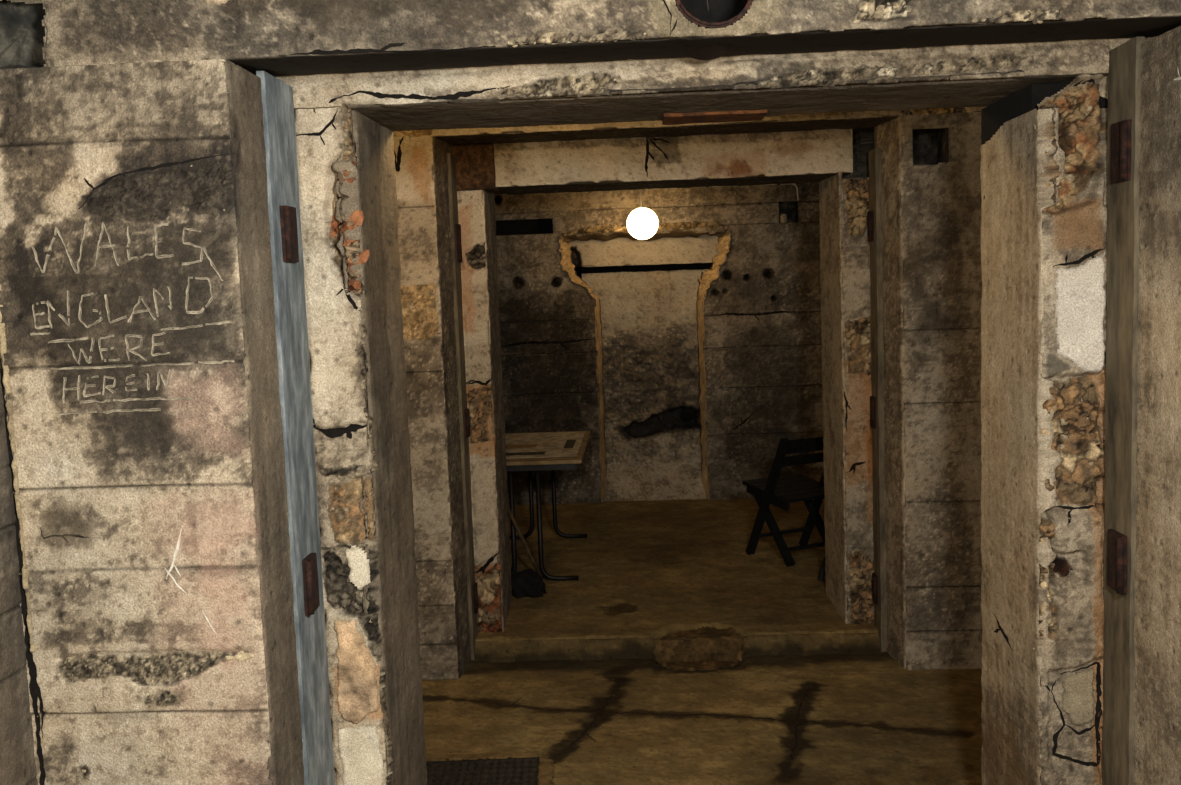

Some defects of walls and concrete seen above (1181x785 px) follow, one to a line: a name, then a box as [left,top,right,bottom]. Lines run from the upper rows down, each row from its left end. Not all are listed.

crack [662,0,677,35]
spalling [852,0,917,24]
crack [79,153,229,209]
crack [296,85,510,145]
spalling [981,82,1108,217]
spalling [559,221,731,503]
spalling [1041,376,1105,507]
crack [0,359,91,785]
spalling [1033,517,1073,650]
spalling [56,649,256,707]
crack [1045,662,1102,767]